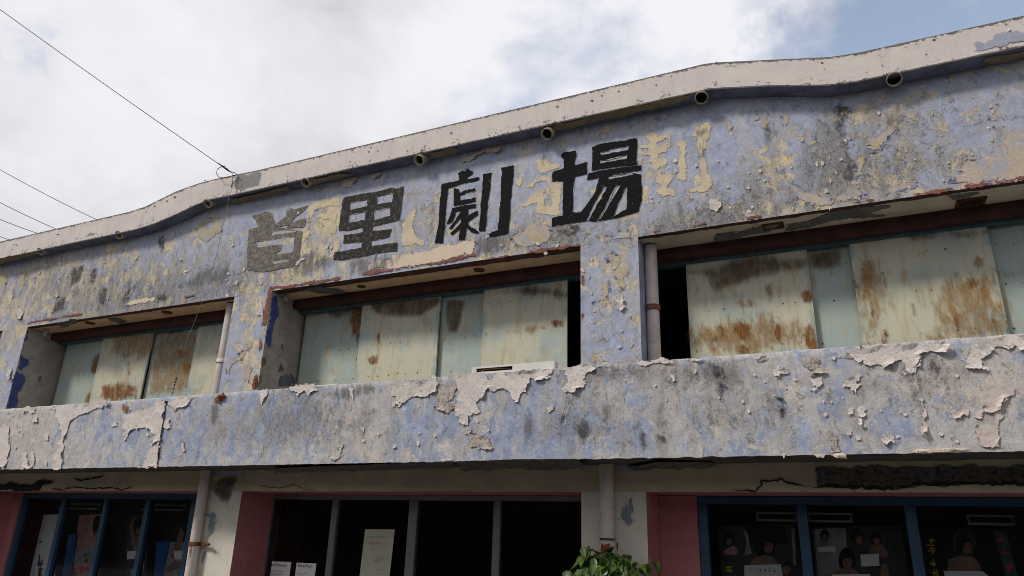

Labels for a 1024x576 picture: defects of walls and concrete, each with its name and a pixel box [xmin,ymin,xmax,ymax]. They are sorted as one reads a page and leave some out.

peeling [307,96,689,349]
peeling [0,400,108,492]
crack [51,476,130,493]
corrosion [84,330,196,414]
peeling [111,395,193,469]
corrosion [329,297,463,338]
peeling [388,355,609,450]
corrosion [690,314,817,354]
corrosion [854,261,887,344]
crack [737,478,1024,502]
spalling [753,334,1024,490]
corrosion [927,256,1008,338]